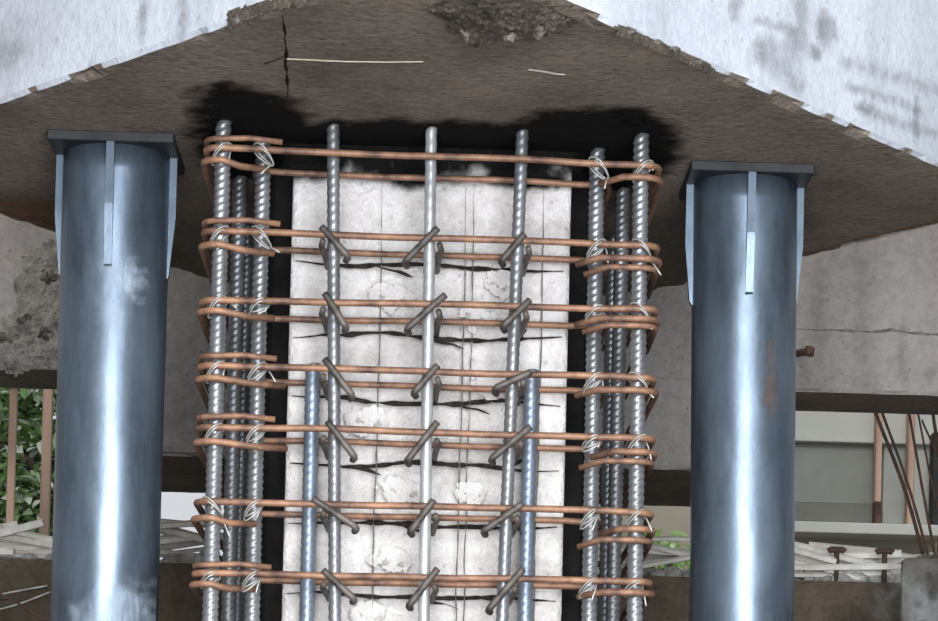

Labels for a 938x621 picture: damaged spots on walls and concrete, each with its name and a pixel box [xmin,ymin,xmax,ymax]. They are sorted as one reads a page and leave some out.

crack [264,14,289,97]
spalling [0,239,60,377]
spalling [459,270,510,334]
crack [293,330,562,350]
spalling [469,377,505,403]
crack [292,395,560,414]
spalling [344,404,388,437]
crack [290,459,552,475]
spalling [374,472,420,502]
crack [288,520,557,536]
spalling [350,600,386,621]
crack [287,591,556,609]